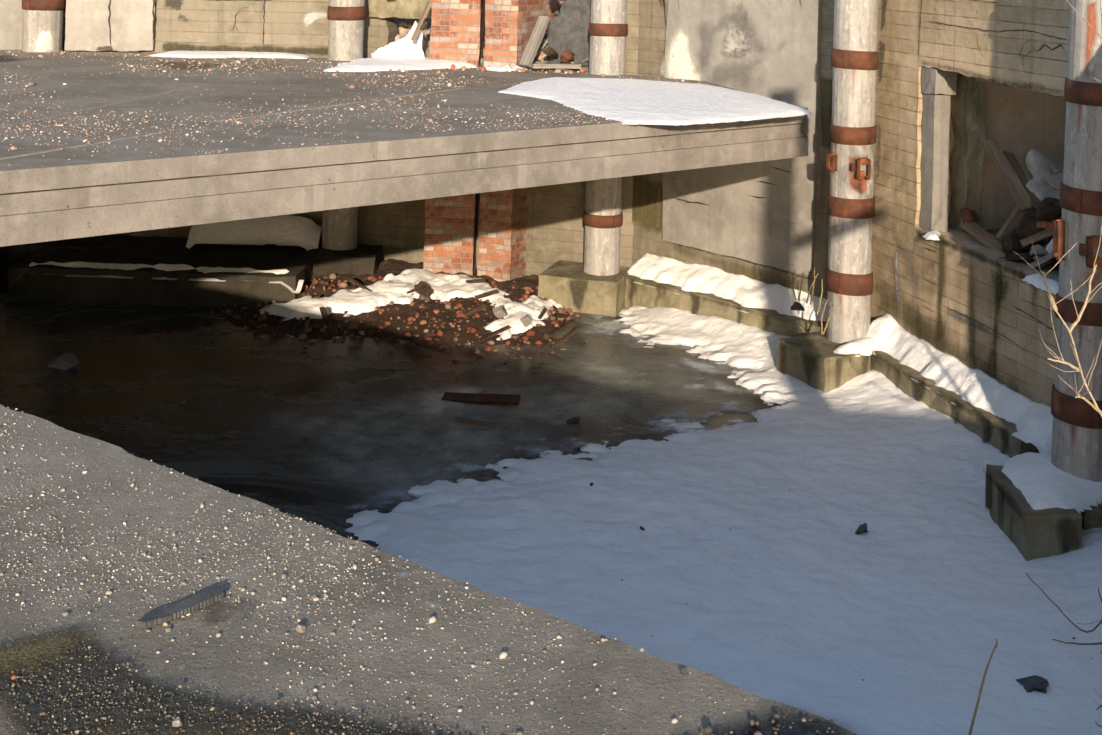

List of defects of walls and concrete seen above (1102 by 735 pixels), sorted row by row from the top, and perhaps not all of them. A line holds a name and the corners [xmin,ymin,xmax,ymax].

corrosion [1087,3,1096,63]
corrosion [850,158,866,192]